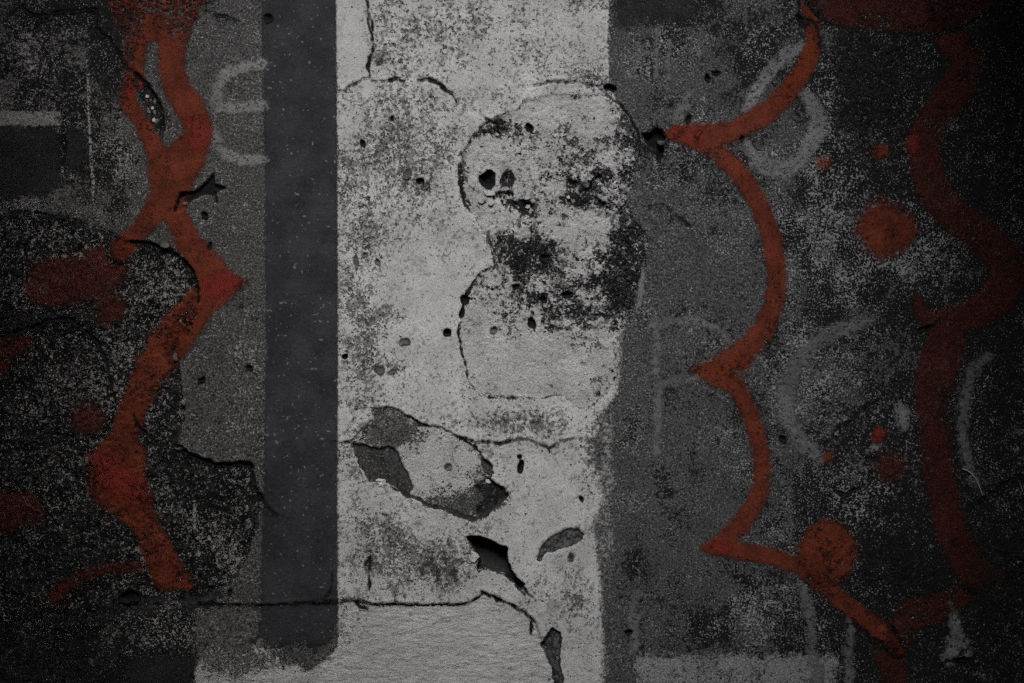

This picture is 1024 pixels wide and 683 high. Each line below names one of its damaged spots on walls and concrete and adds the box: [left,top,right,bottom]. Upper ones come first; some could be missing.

crack [336,0,458,102]
crack [533,80,641,146]
crack [456,330,468,378]
peeling [0,208,262,635]
peeling [350,406,511,522]
crack [197,532,536,634]
hole [466,535,525,590]
peeling [537,528,584,562]
spalling [540,628,564,683]